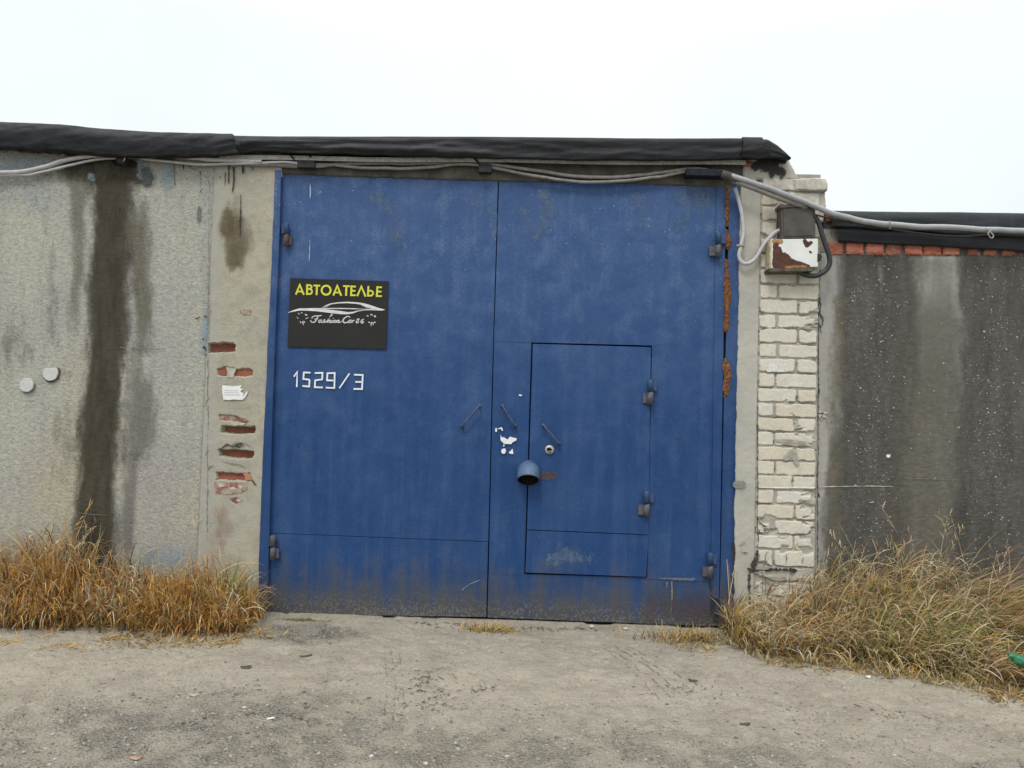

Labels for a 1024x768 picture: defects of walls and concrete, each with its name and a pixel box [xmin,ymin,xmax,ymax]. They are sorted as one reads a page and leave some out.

damp [220,195,247,268]
damp [63,158,155,584]
flaking render [218,367,253,378]
flaking render [214,415,256,504]
damp [824,243,1024,607]